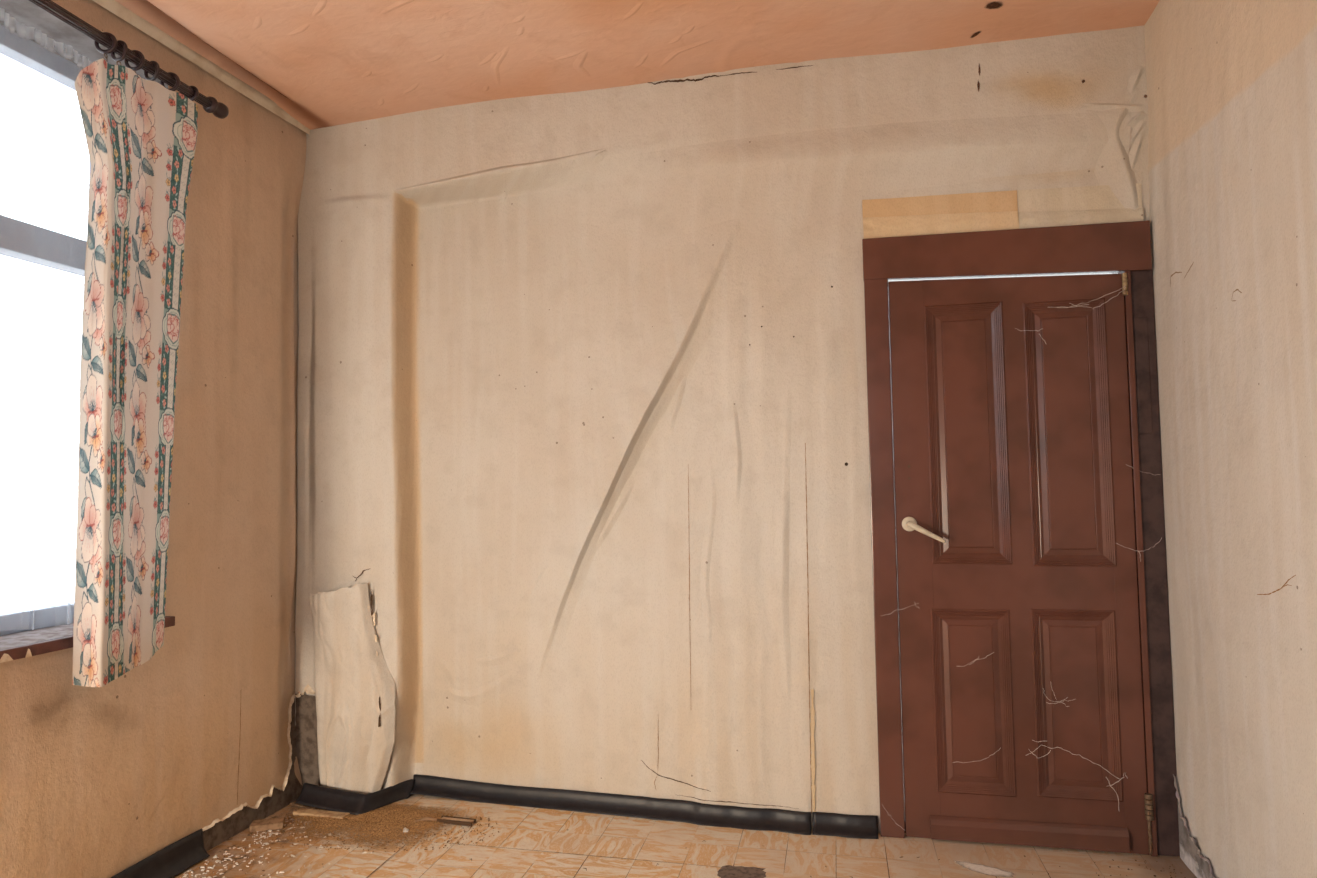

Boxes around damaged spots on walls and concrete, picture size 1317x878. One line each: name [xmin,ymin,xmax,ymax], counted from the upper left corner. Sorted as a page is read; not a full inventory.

flaking render [182,694,417,878]
peeling [1173,775,1216,878]